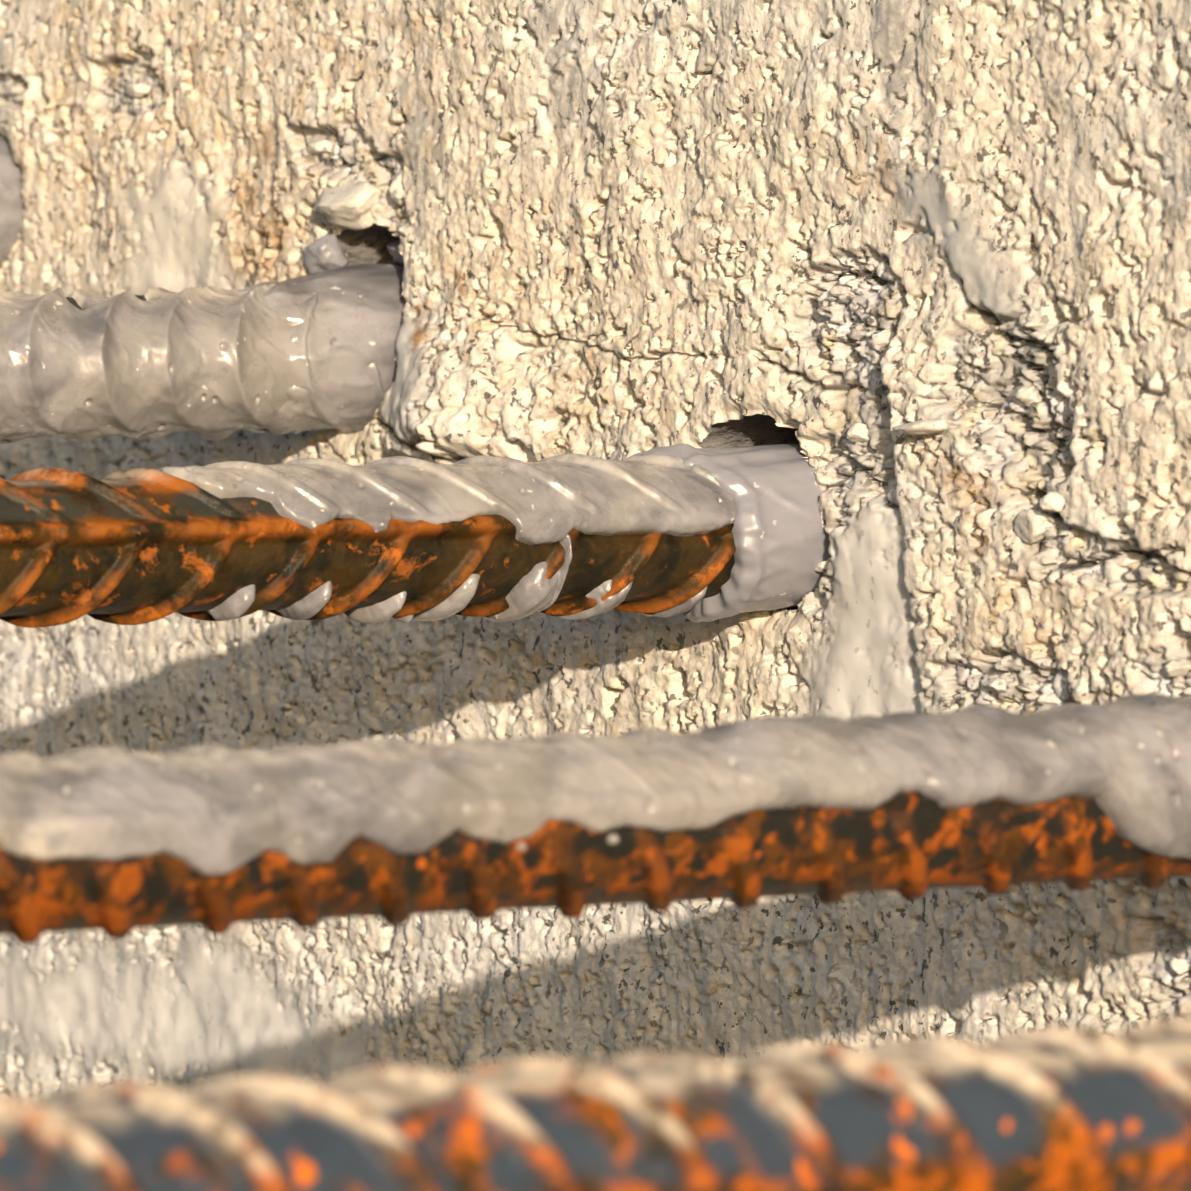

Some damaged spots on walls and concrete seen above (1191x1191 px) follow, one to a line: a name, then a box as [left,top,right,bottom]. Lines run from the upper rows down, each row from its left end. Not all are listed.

spalling [293,122,410,231]
crack [478,316,725,360]
crack [753,355,865,393]
spalling [799,248,1191,595]
spalling [807,558,835,608]